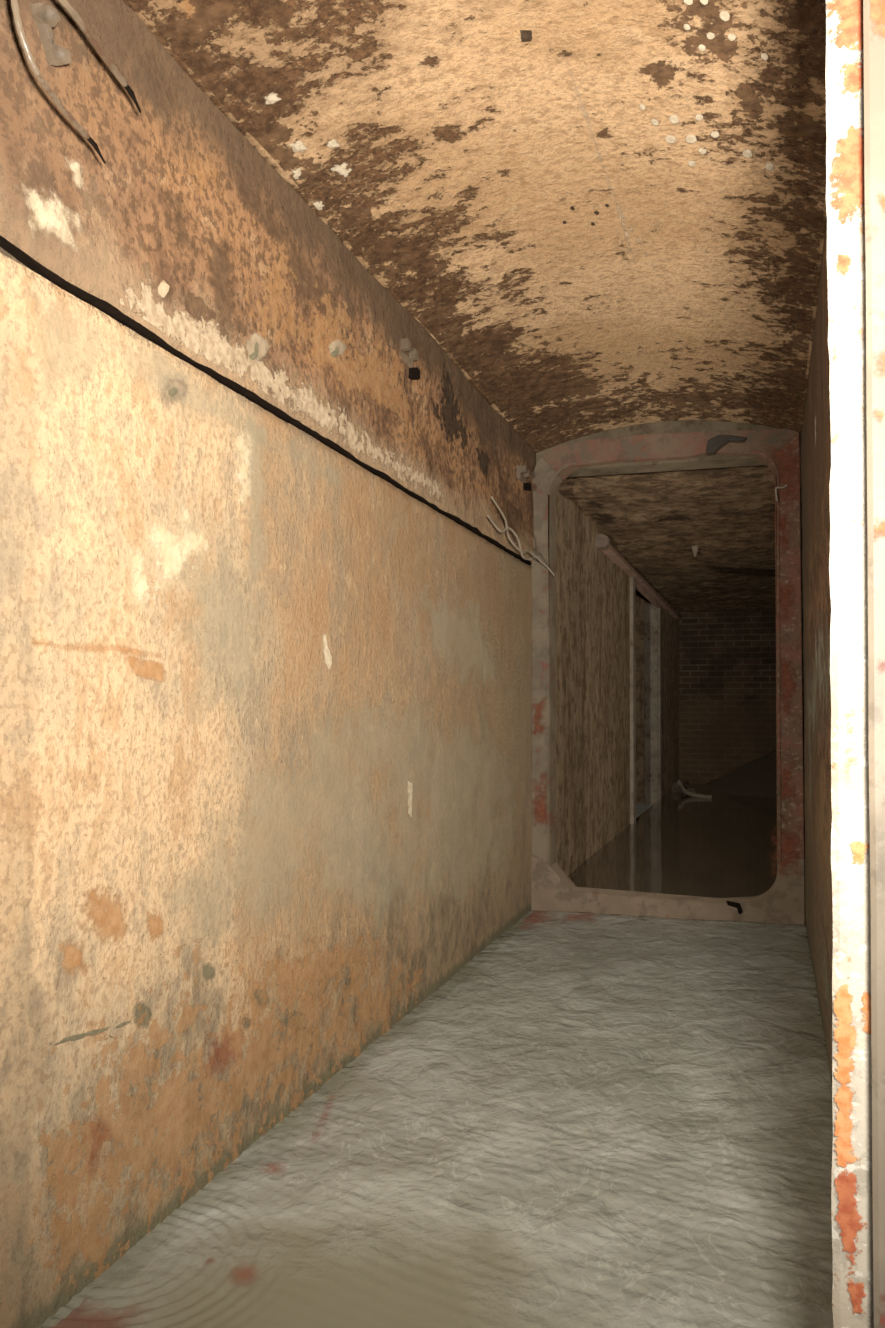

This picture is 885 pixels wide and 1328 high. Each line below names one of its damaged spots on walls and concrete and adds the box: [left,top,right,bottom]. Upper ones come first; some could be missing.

water stain [684,0,736,52]
rust [827,0,885,98]
water stain [639,104,719,167]
rust [828,125,865,224]
water stain [210,241,233,339]
water stain [238,178,340,318]
peeling [119,0,827,504]
rust [836,254,851,275]
rust [850,841,870,864]
rust [834,977,871,1314]